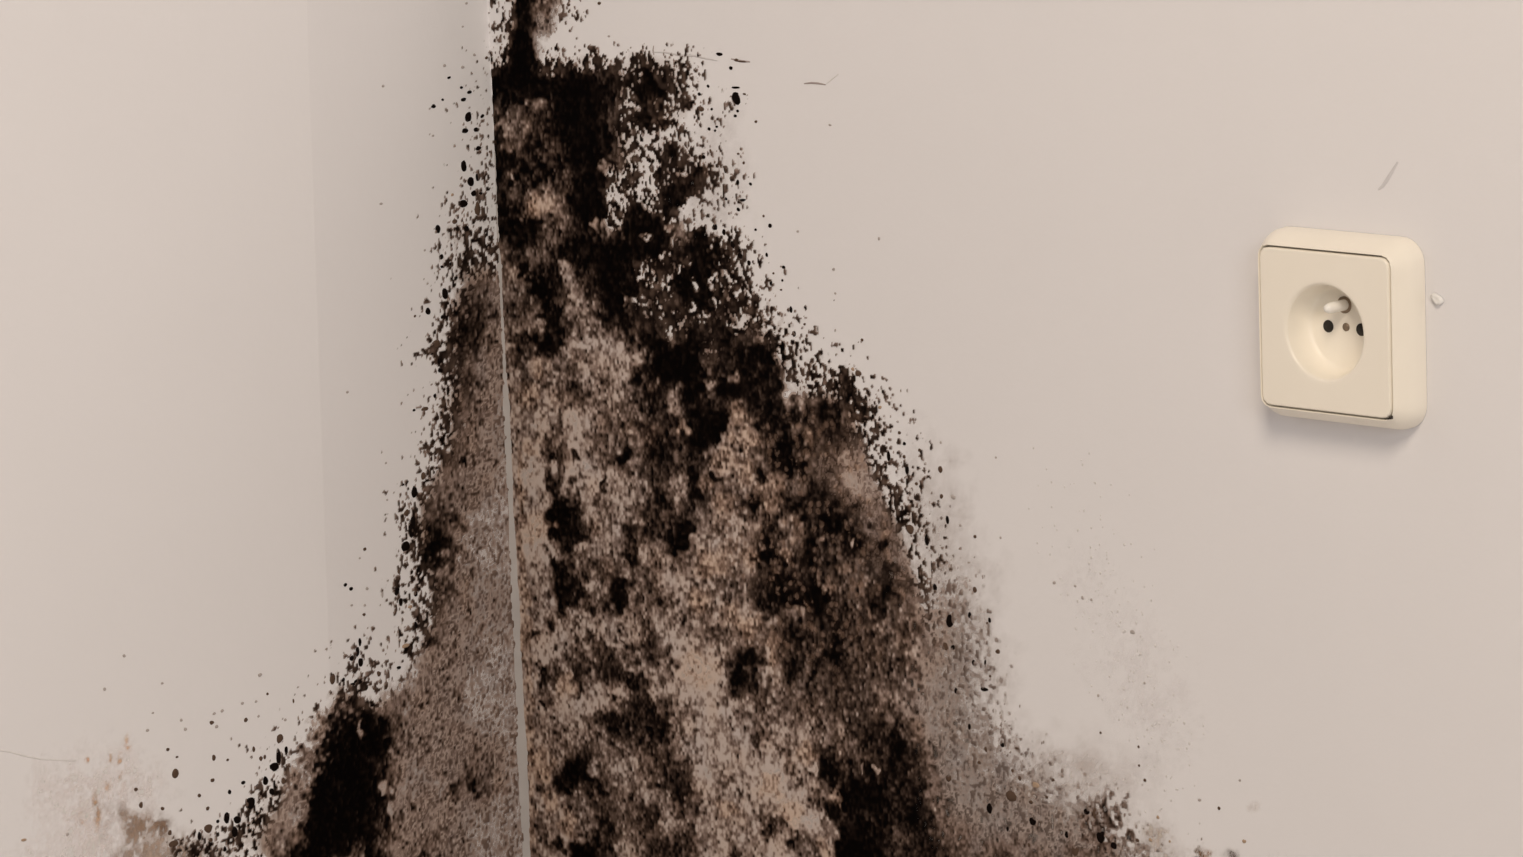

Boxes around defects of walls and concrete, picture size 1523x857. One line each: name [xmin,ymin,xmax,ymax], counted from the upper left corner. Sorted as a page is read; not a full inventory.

leakage [66,0,1163,857]